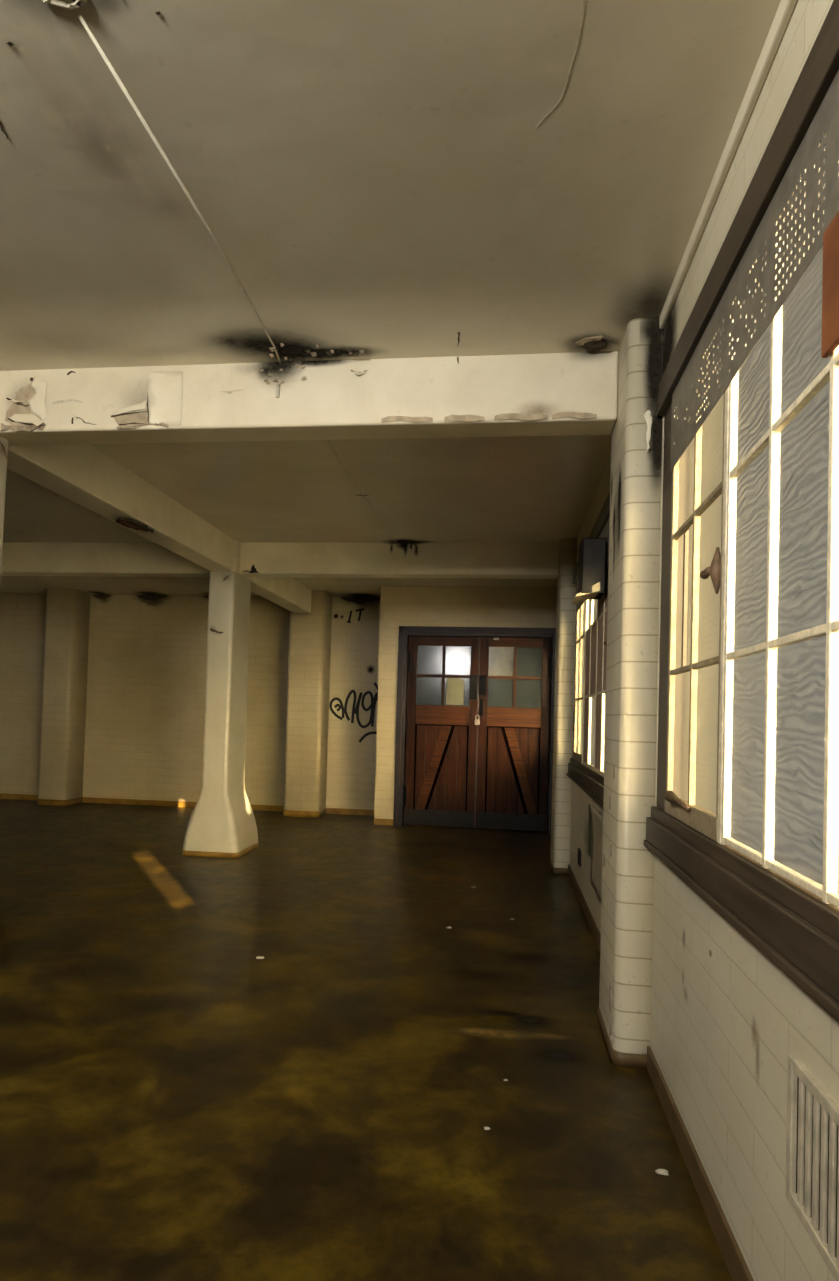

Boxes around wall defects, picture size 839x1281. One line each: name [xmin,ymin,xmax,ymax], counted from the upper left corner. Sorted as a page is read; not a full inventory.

spalling [42,0,87,10]
peeling [1,377,48,432]
peeling [110,371,183,429]